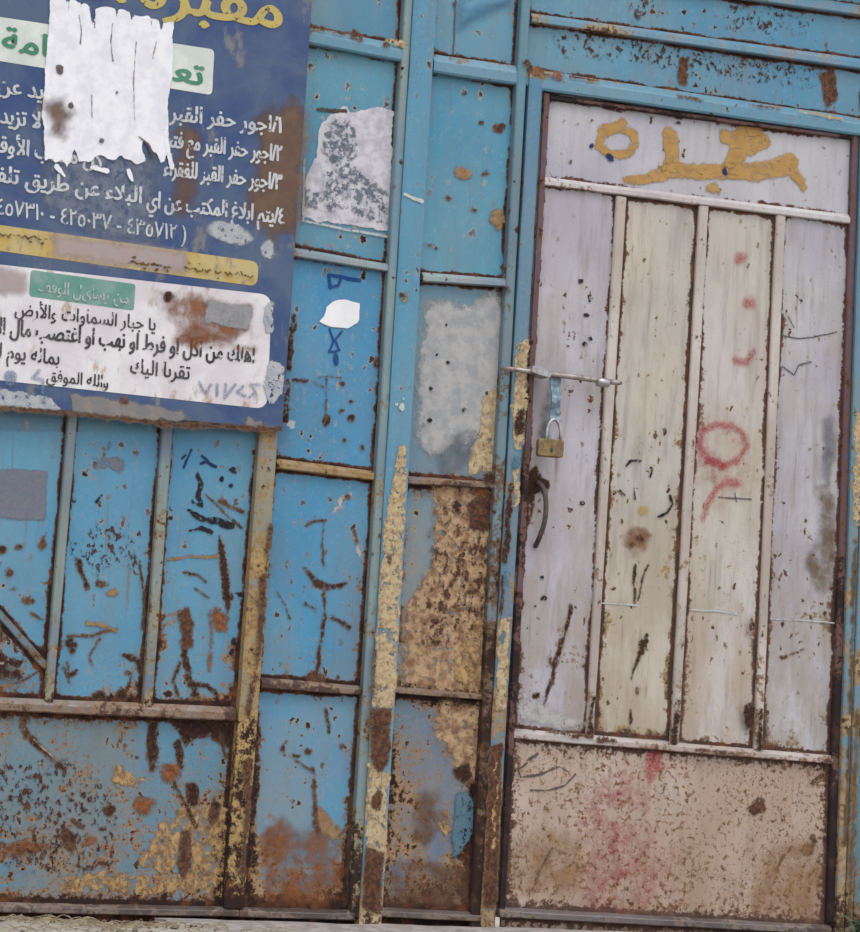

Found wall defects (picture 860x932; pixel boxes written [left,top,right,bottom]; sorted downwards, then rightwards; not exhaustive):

corrosion [557,32,843,121]
corrosion [0,313,297,432]
corrosion [164,291,244,348]
peeling [468,388,497,475]
peeling [510,339,530,507]
corrosion [422,472,495,648]
corrosion [167,523,274,877]
peeling [371,445,491,871]
peeling [495,617,513,711]
corrosion [0,759,118,875]
corrosion [262,708,392,903]
peeling [365,763,391,872]